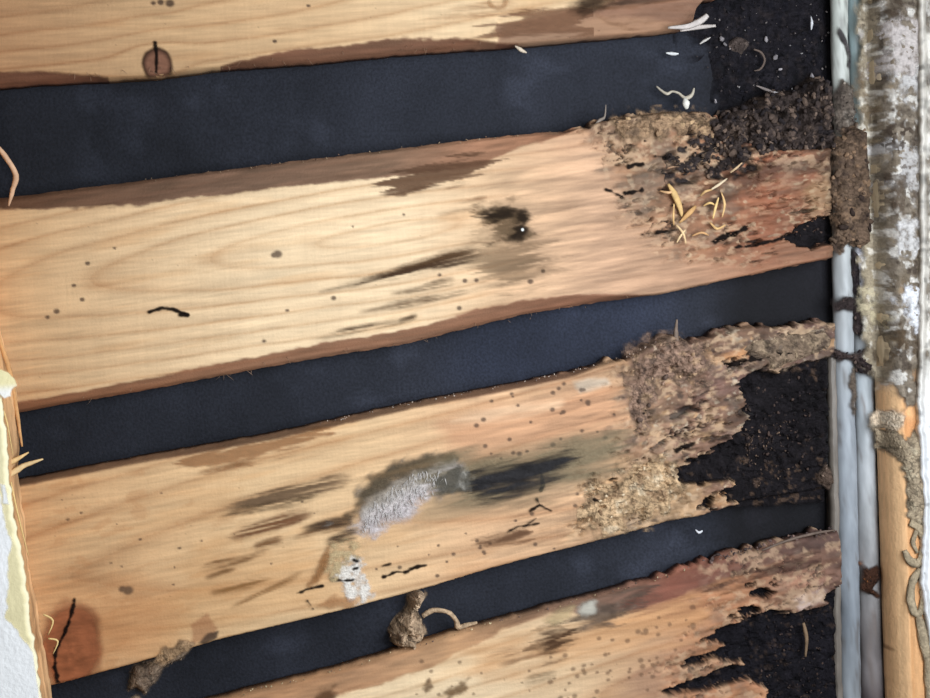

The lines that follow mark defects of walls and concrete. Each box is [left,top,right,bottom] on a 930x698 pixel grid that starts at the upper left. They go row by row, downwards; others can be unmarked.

spalling [661,119,757,190]
water stain [356,251,469,285]
water stain [479,207,532,245]
spalling [782,216,832,249]
spalling [677,357,829,508]
water stain [232,439,623,603]
peeling [0,485,39,698]
water stain [211,557,251,577]
water stain [218,579,291,602]
corrosion [858,562,880,598]
crack [52,598,76,683]
spalling [662,583,837,698]